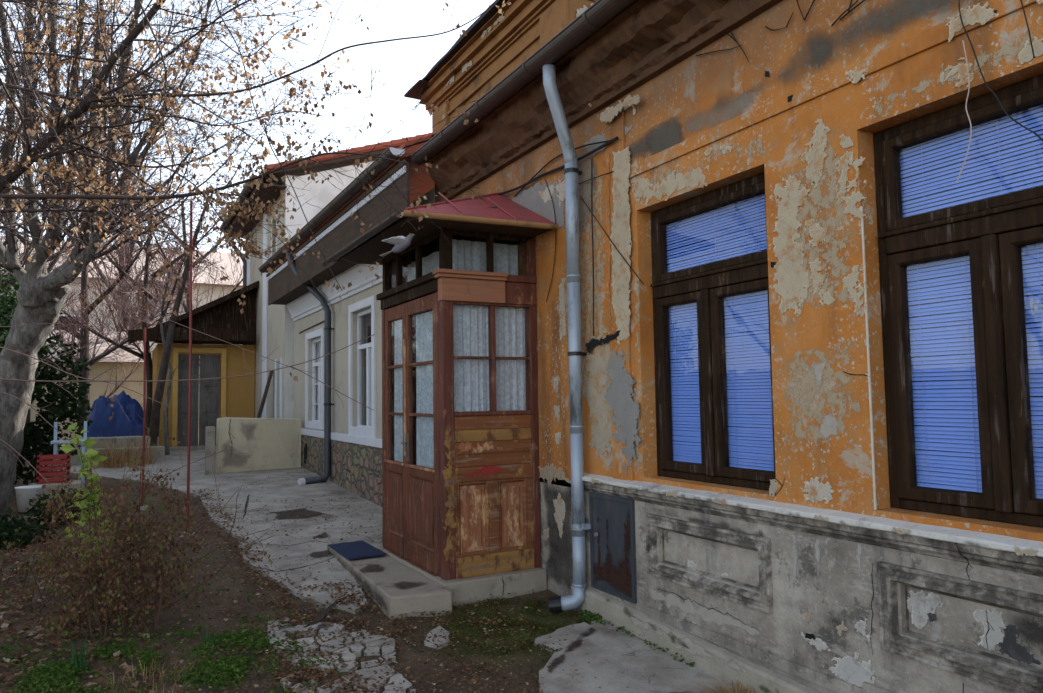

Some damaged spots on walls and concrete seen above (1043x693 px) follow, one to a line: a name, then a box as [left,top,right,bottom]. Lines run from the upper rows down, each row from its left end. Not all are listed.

water stain [780,0,954,78]
flaking render [945,2,999,42]
water stain [629,98,747,156]
flaking render [773,119,867,317]
flaking render [582,95,733,475]
peeling [442,426,506,561]
flaking render [802,477,834,522]
rust [593,515,632,598]
crack [956,543,972,580]
peeling [801,632,875,687]
peeling [907,590,944,629]
peeling [973,608,1041,665]